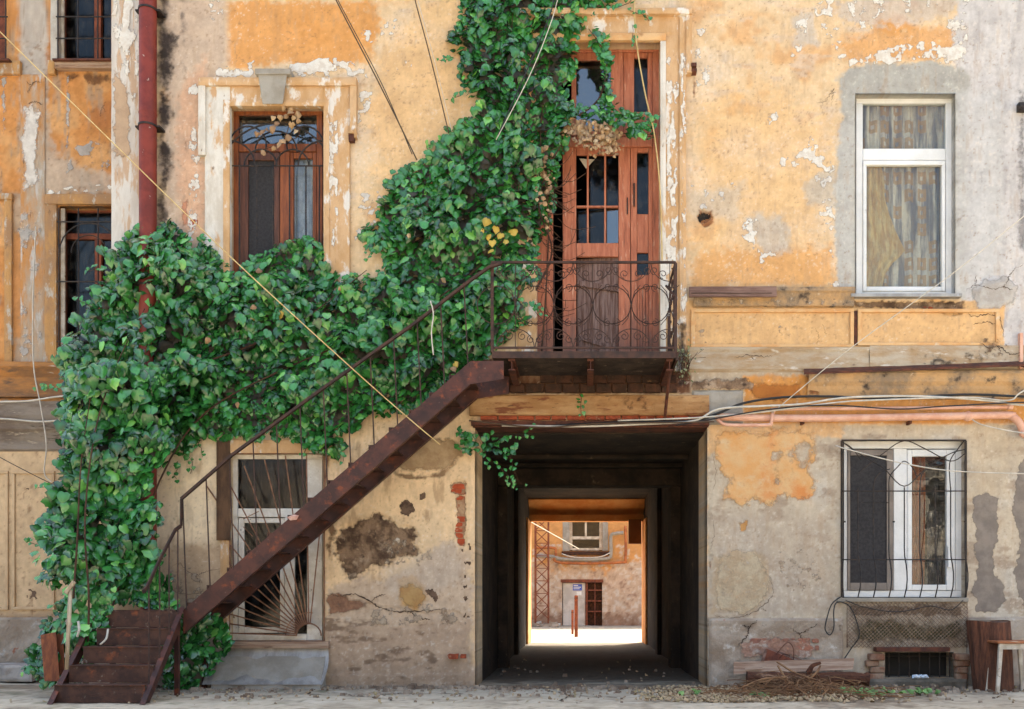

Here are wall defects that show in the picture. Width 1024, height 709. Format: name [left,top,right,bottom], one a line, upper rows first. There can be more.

peeling [101,0,139,167]
damp [157,0,177,125]
peeling [791,0,970,67]
peeling [66,141,99,173]
damp [157,141,172,222]
peeling [665,28,736,275]
peeling [780,138,835,230]
peeling [742,218,776,269]
peeling [665,283,687,317]
peeling [692,377,816,507]
spalling [326,482,471,625]
crack [326,593,440,620]